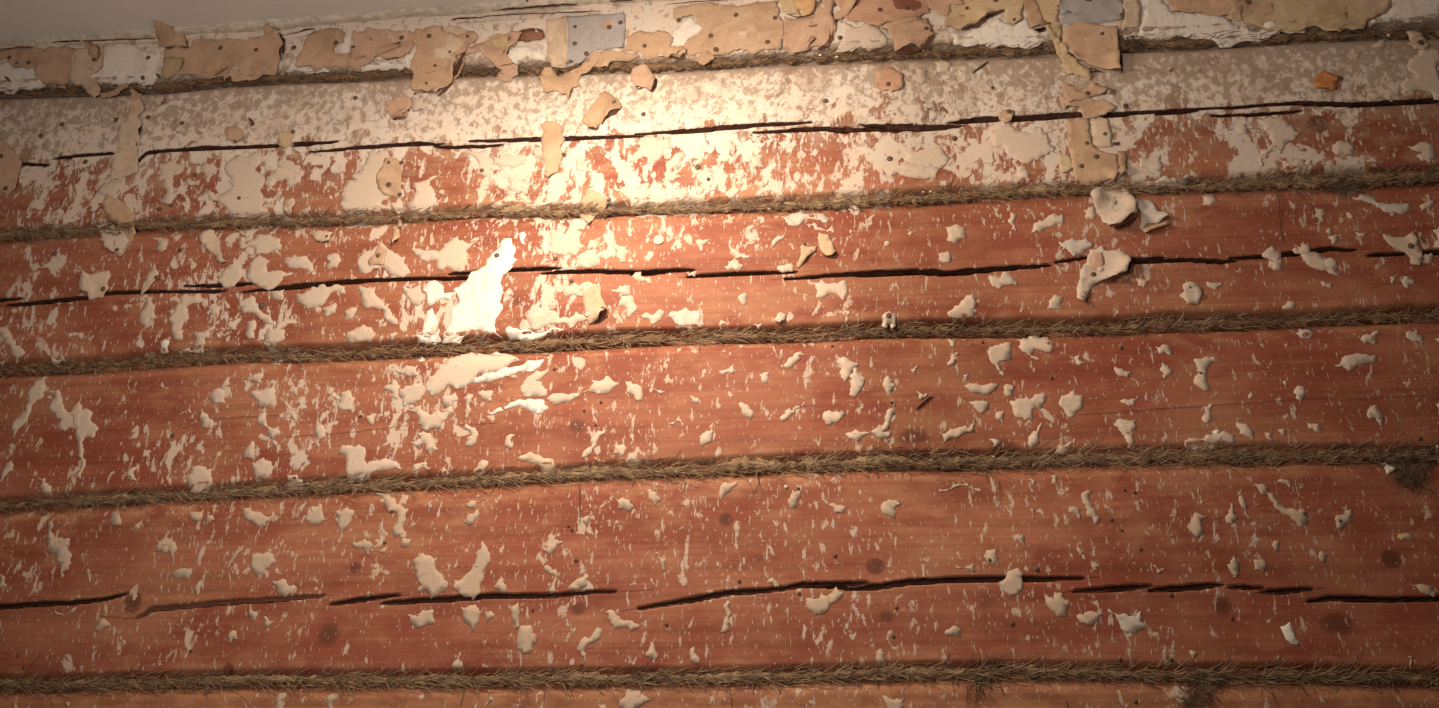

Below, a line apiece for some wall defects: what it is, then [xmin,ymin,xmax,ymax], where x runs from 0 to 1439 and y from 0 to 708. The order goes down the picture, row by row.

crack [21,98,1439,167]
peeling [156,150,305,219]
peeling [340,149,441,216]
peeling [614,137,769,208]
crack [0,271,471,306]
peeling [139,234,477,354]
peeling [526,230,728,331]
crack [505,256,1088,280]
peeling [771,211,835,247]
crack [1133,246,1439,264]
peeling [1262,194,1435,289]
crack [0,576,1439,619]